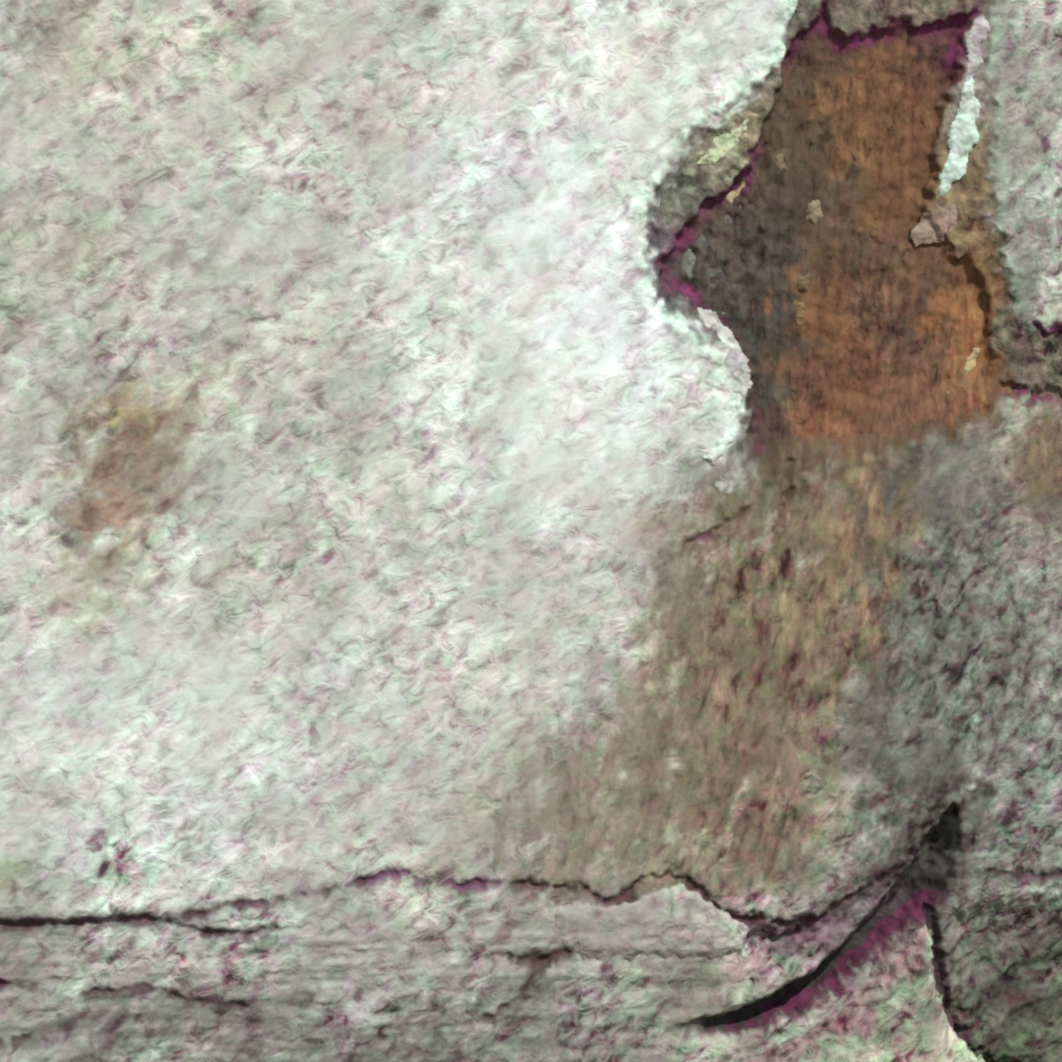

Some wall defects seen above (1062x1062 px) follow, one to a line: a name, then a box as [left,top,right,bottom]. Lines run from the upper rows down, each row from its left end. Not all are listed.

spalling [646,0,1062,497]
damp [746,497,1041,955]
crack [0,899,279,938]
crack [83,982,249,1012]
crack [325,828,1010,1062]
crack [1006,983,1035,1008]